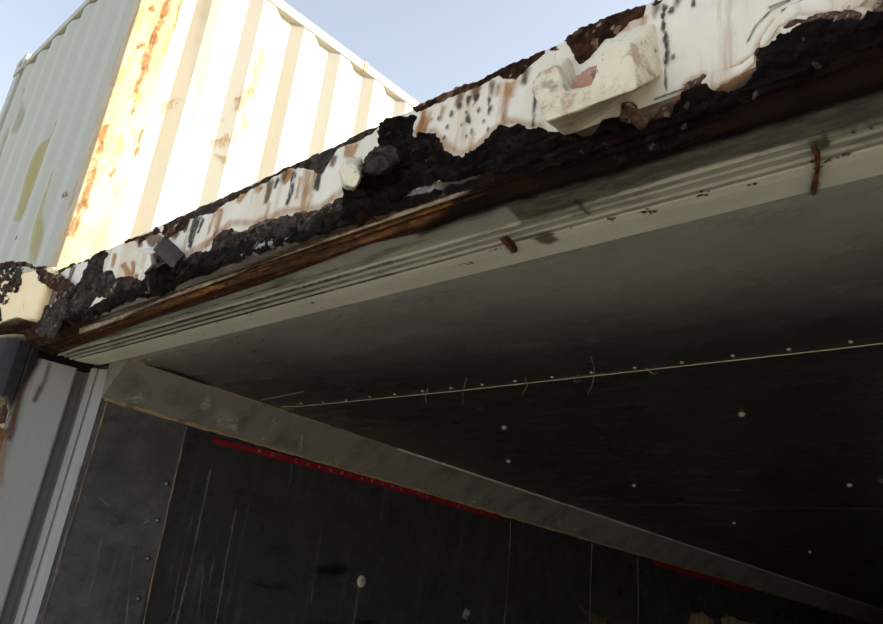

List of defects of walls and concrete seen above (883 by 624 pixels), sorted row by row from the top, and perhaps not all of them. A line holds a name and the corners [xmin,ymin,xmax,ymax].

corrosion [0,0,883,446]